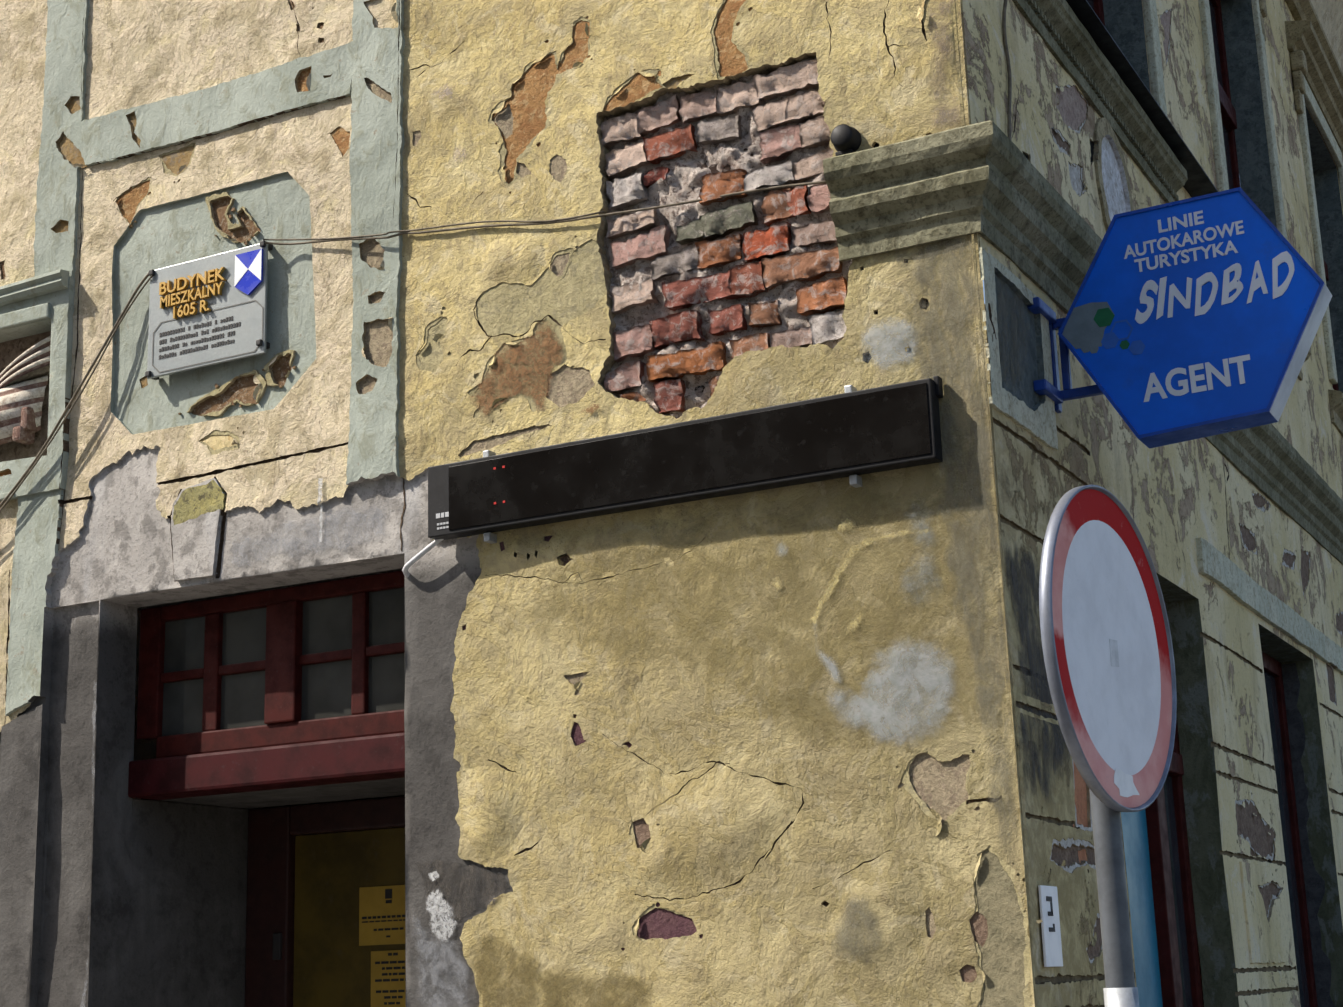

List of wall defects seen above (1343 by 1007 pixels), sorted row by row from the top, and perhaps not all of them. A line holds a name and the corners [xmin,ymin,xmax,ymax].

peeling [206,192,261,245]
flaking render [458,0,852,458]
peeling [178,350,297,455]
peeling [1326,657,1338,705]
crack [603,734,804,901]
flaking render [896,749,1002,836]
flaking render [1048,759,1096,884]
peeling [1234,793,1284,923]
peeling [1281,663,1335,1007]
peeling [621,902,703,951]
peeling [925,907,936,939]
flaking render [959,845,1043,1007]